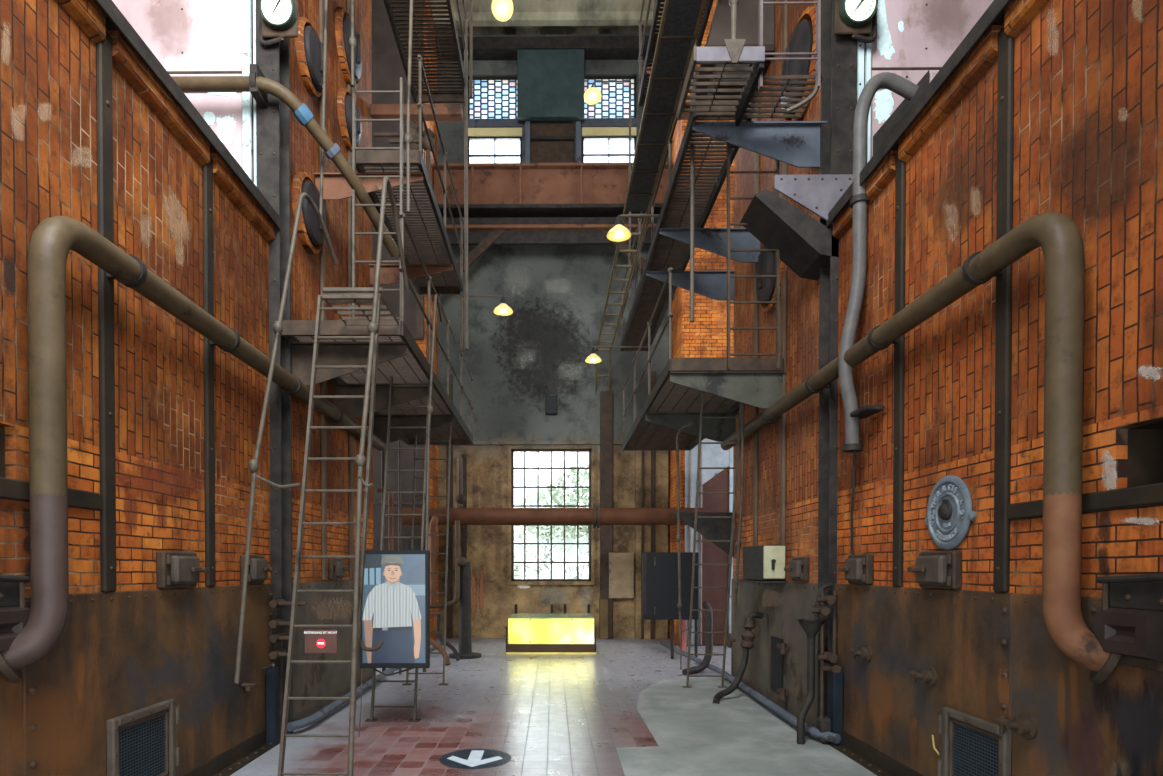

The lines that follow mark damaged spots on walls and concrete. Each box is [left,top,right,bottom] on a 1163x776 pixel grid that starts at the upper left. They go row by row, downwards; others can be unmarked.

peeling [203,112,237,157]